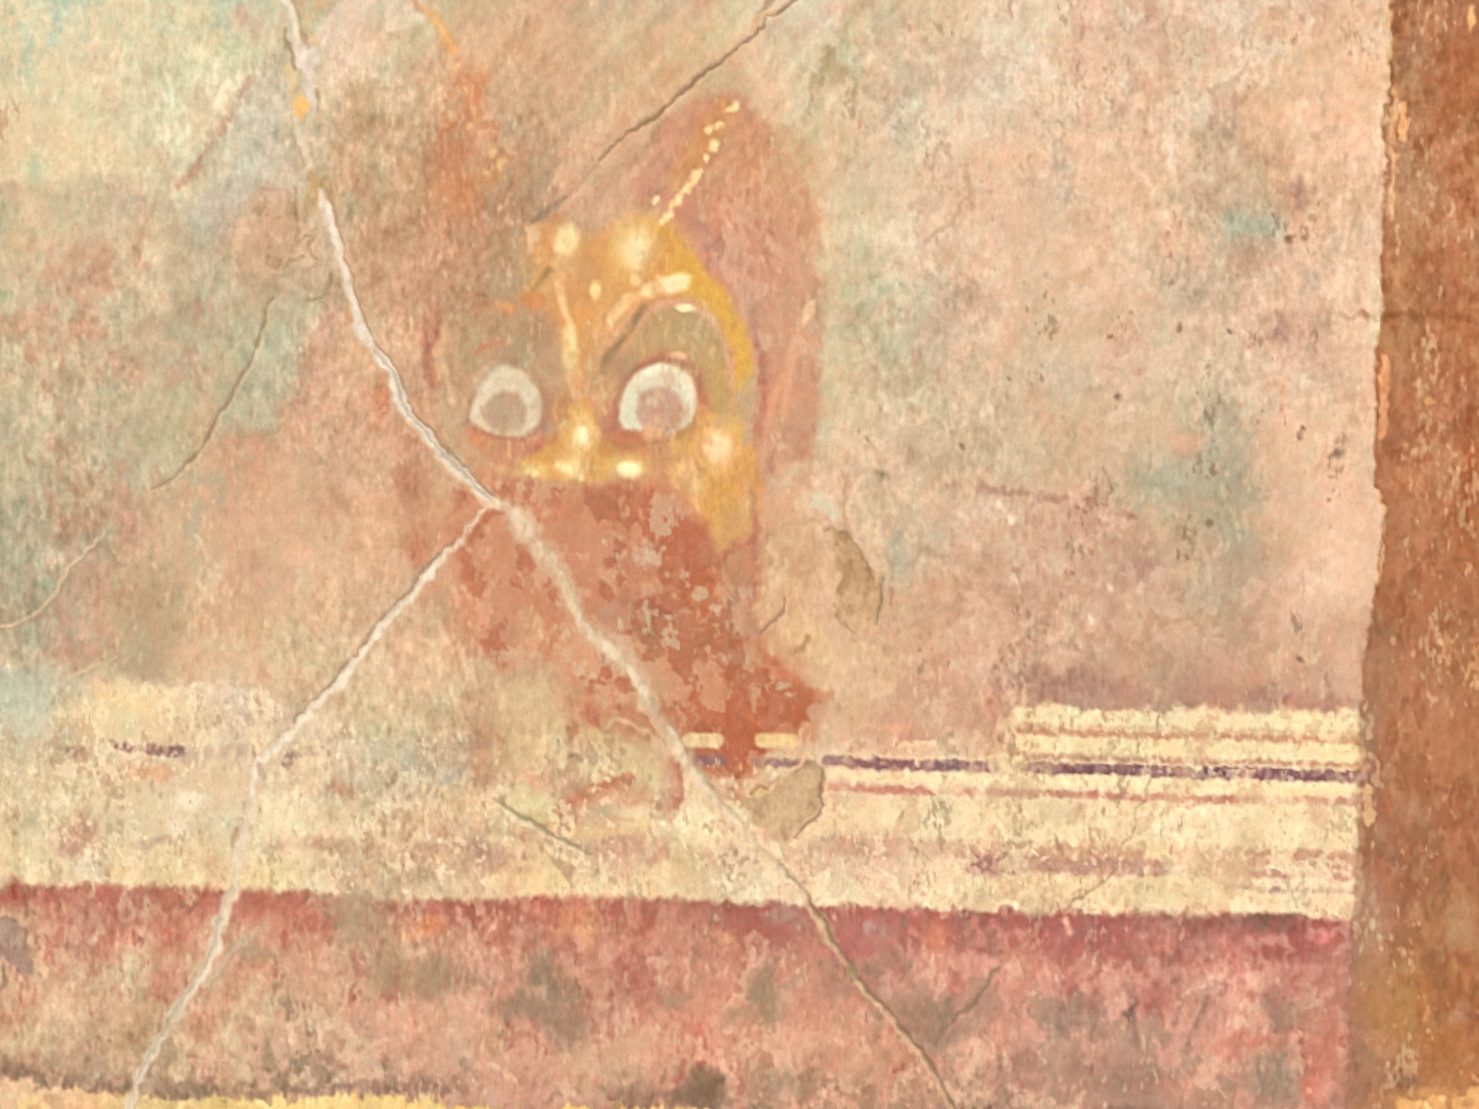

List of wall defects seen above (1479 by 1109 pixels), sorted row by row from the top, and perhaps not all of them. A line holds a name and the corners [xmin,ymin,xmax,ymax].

crack [118,0,958,1109]
spalling [751,466,915,732]
spalling [738,727,836,849]